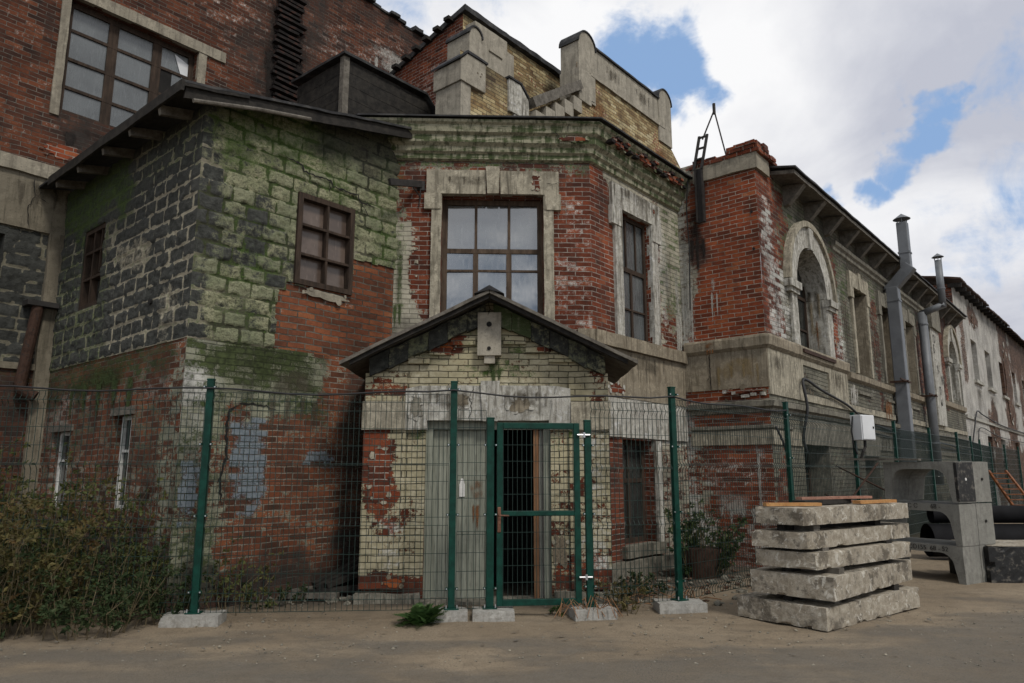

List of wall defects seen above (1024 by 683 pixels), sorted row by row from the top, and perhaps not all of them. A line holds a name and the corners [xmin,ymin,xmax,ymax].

peeling [408,243,418,299]
water stain [676,239,706,351]
crack [218,402,276,505]
peeling [229,417,268,516]
peeling [366,444,394,504]
spalling [552,531,569,569]